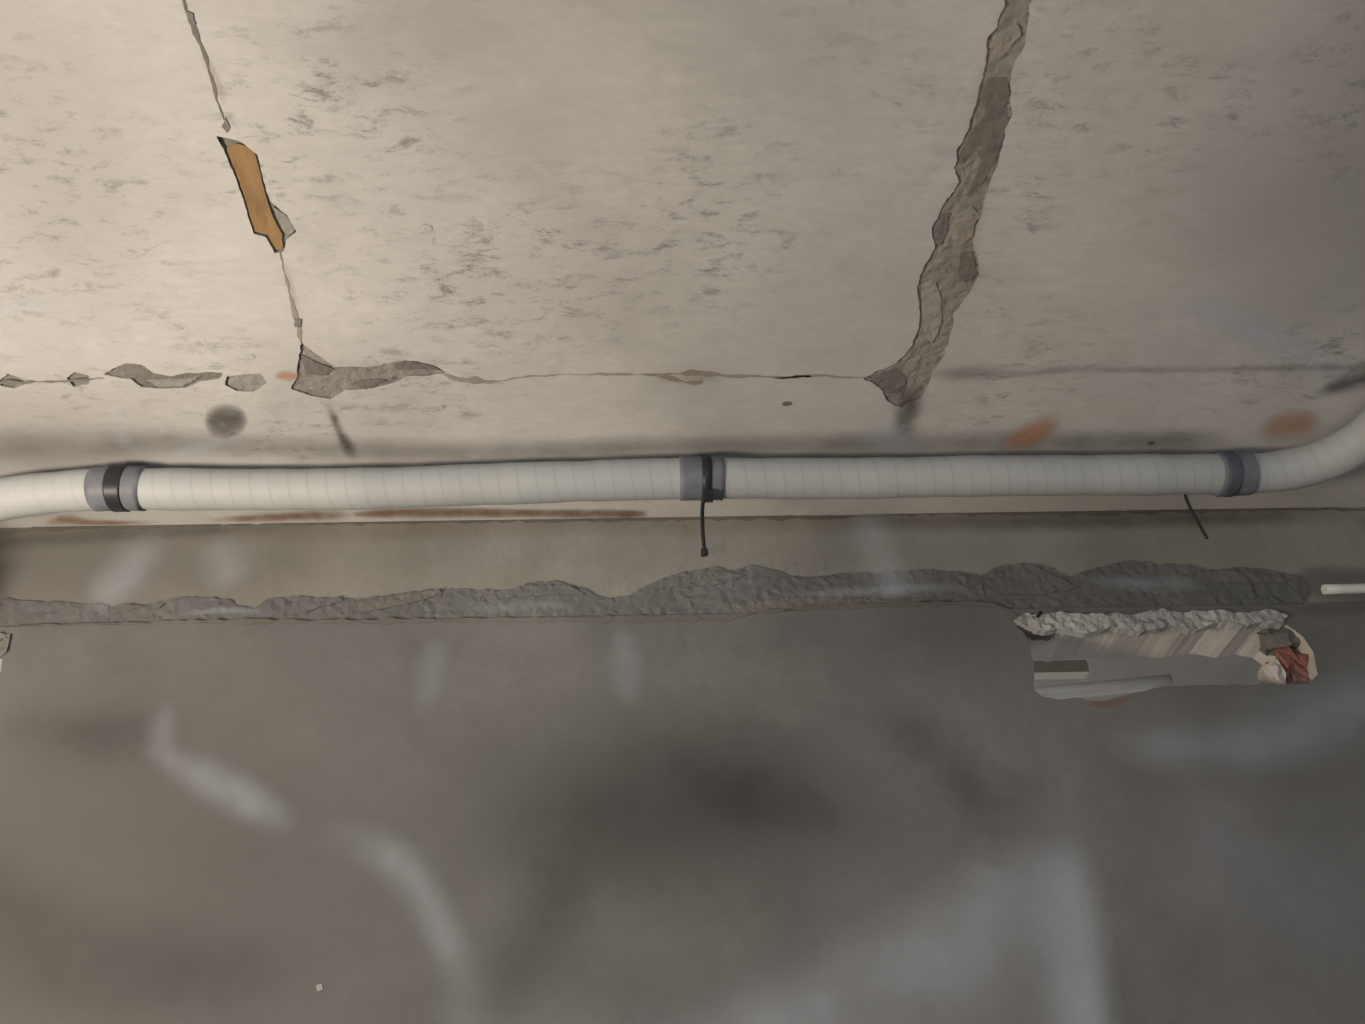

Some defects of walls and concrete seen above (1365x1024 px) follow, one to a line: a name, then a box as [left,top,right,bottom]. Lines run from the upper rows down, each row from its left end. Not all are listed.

crack [182,0,224,119]
peeling [274,205,295,237]
crack [279,252,302,345]
crack [0,377,103,385]
crack [441,369,869,385]
spalling [1013,608,1311,684]